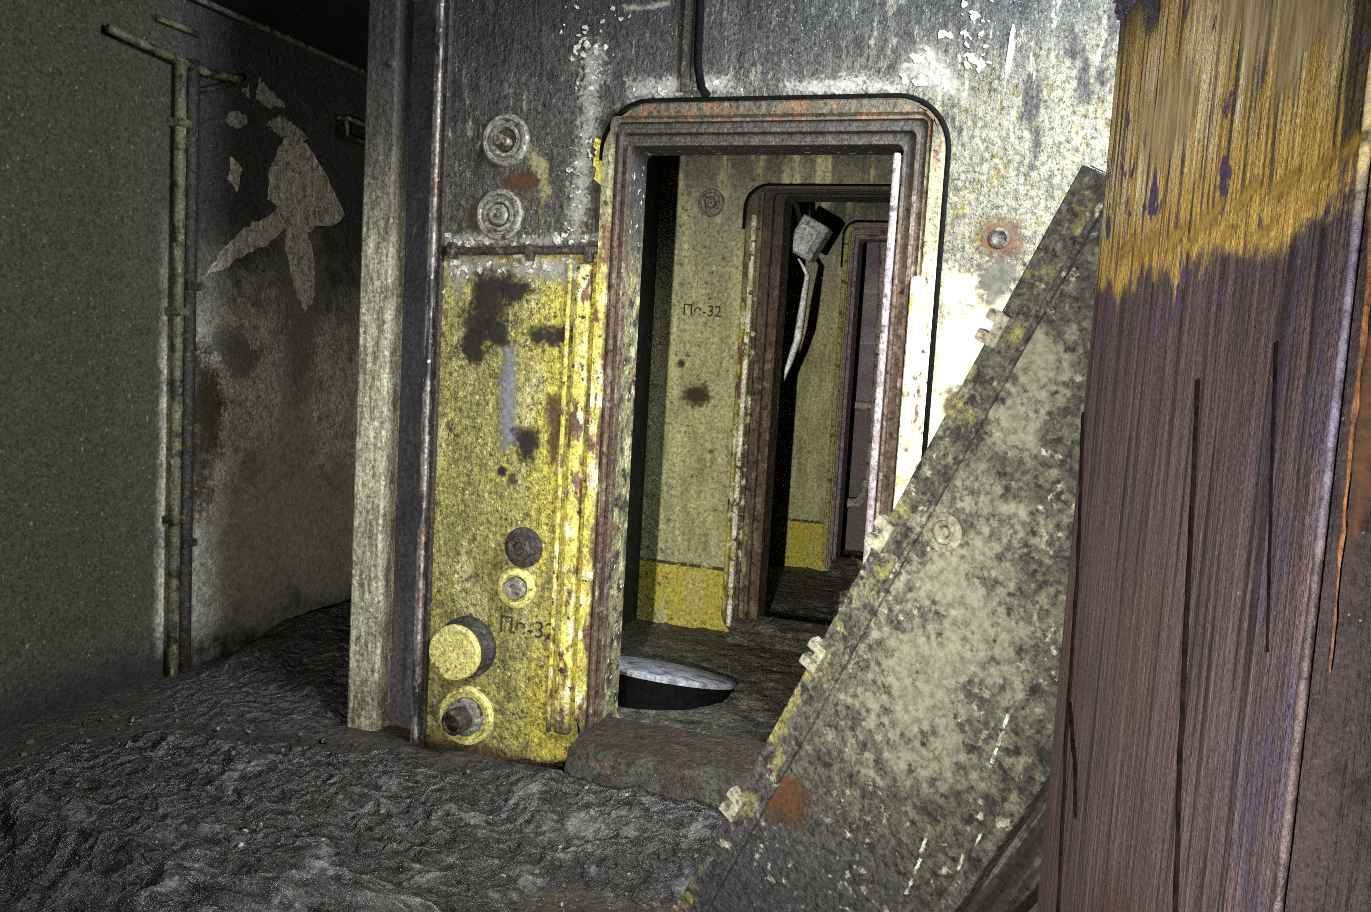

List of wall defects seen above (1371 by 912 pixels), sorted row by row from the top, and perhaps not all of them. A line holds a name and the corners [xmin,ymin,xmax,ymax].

peeling [779,0,1015,102]
peeling [442,1,743,294]
corrosion [981,218,1023,259]
corrosion [683,383,711,408]
corrosion [1328,190,1371,673]